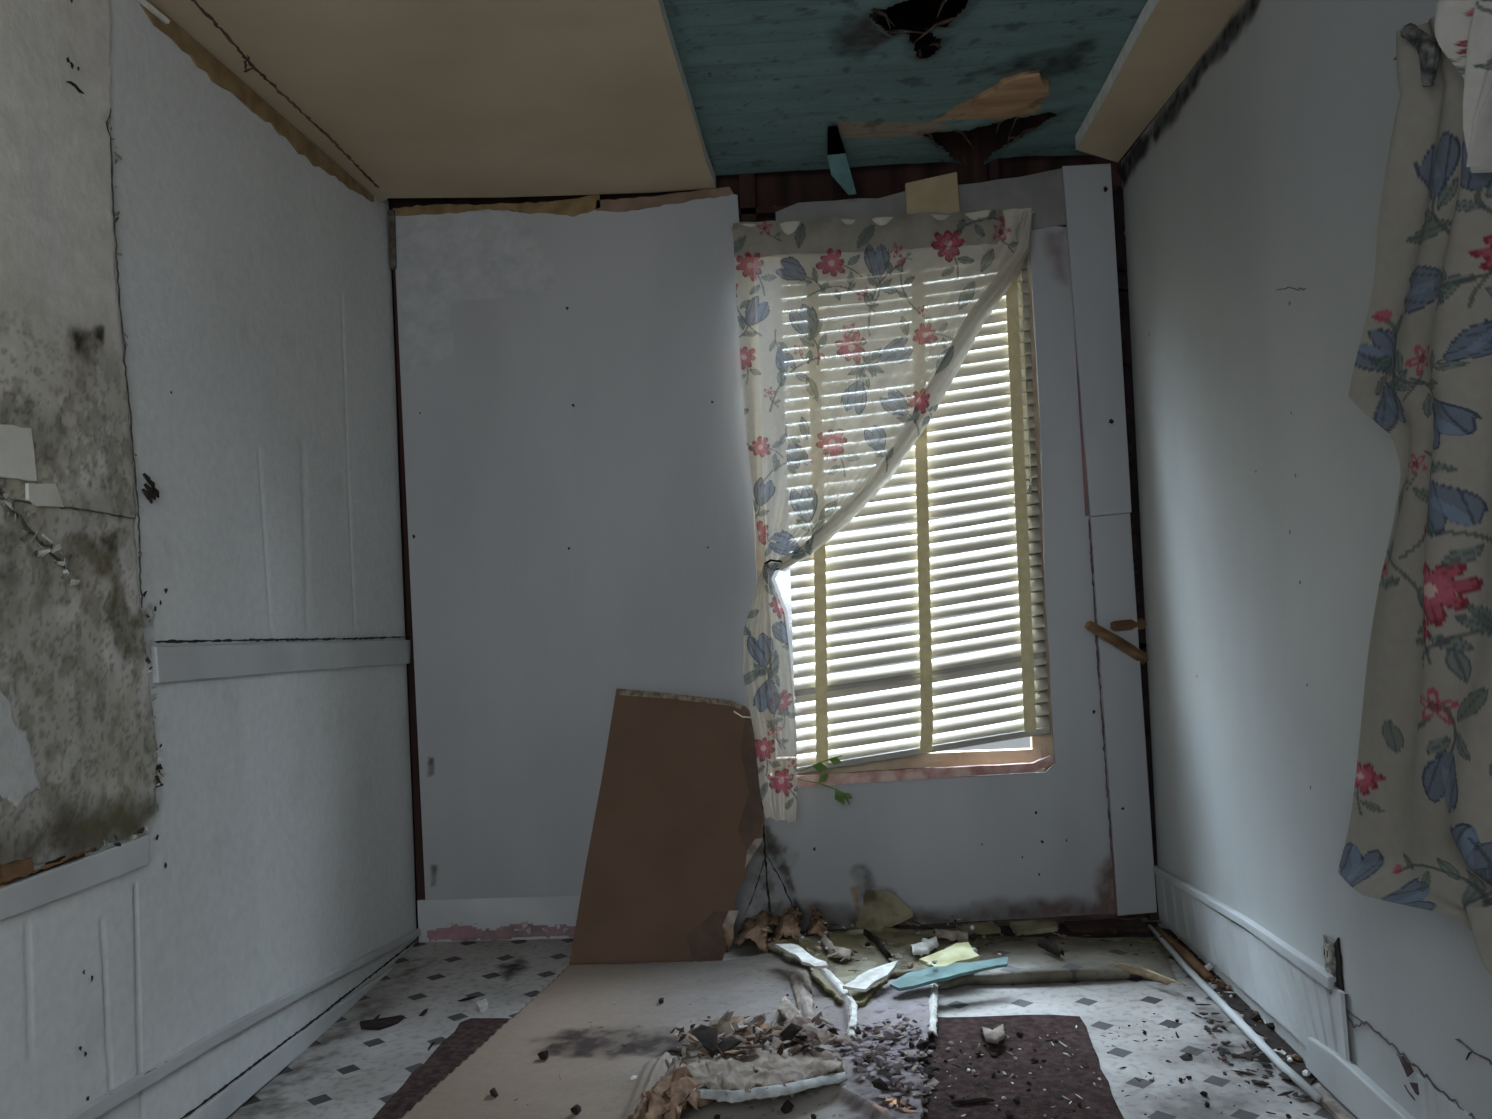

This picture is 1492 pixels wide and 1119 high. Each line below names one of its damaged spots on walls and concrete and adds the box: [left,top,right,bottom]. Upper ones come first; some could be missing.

leakage [1118,0,1259,186]
crack [0,108,143,608]
leakage [74,329,103,358]
crack [391,271,399,380]
leakage [73,534,154,657]
crack [154,635,409,643]